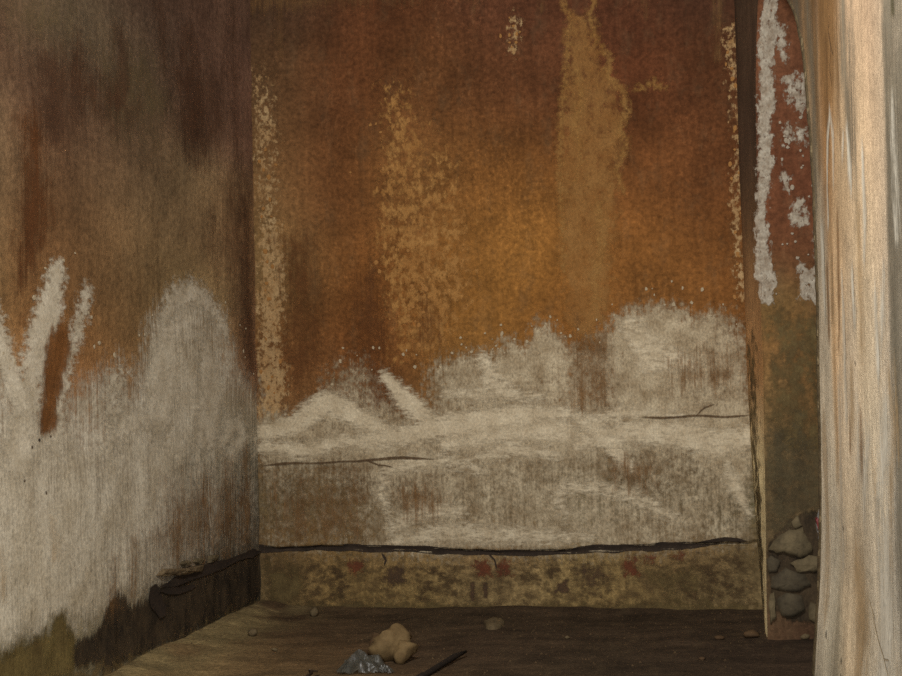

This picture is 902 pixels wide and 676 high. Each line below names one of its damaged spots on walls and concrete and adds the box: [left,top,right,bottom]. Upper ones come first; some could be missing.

damp [41,324,71,434]
crack [149,537,746,619]
damp [543,0,865,614]
spalling [722,0,826,676]